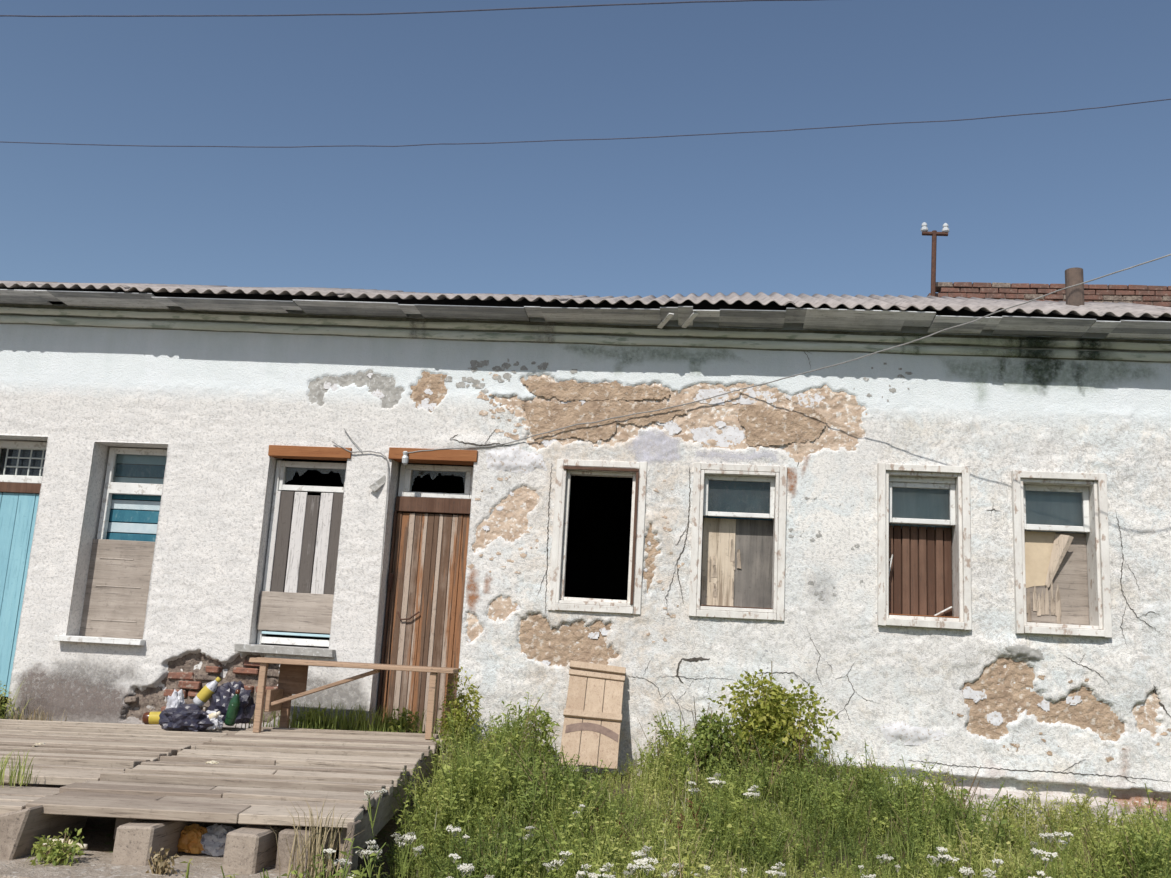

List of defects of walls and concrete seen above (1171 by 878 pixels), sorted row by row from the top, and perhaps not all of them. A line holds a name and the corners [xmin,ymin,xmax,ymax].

spalling [307,359,912,463]
water stain [982,337,1061,387]
water stain [1077,338,1104,376]
flaking render [467,475,540,573]
spalling [466,596,619,667]
spalling [952,657,1171,762]